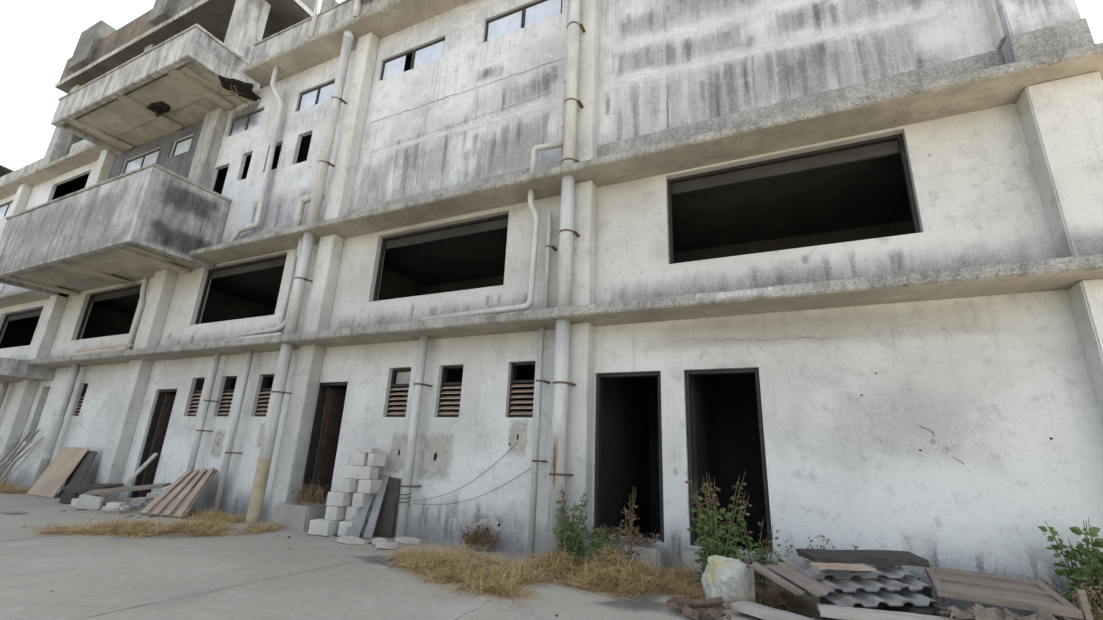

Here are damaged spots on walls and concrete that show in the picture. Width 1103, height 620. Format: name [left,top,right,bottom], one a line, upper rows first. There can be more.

leakage [649,28,929,133]
leakage [166,187,216,218]
leakage [155,223,210,253]